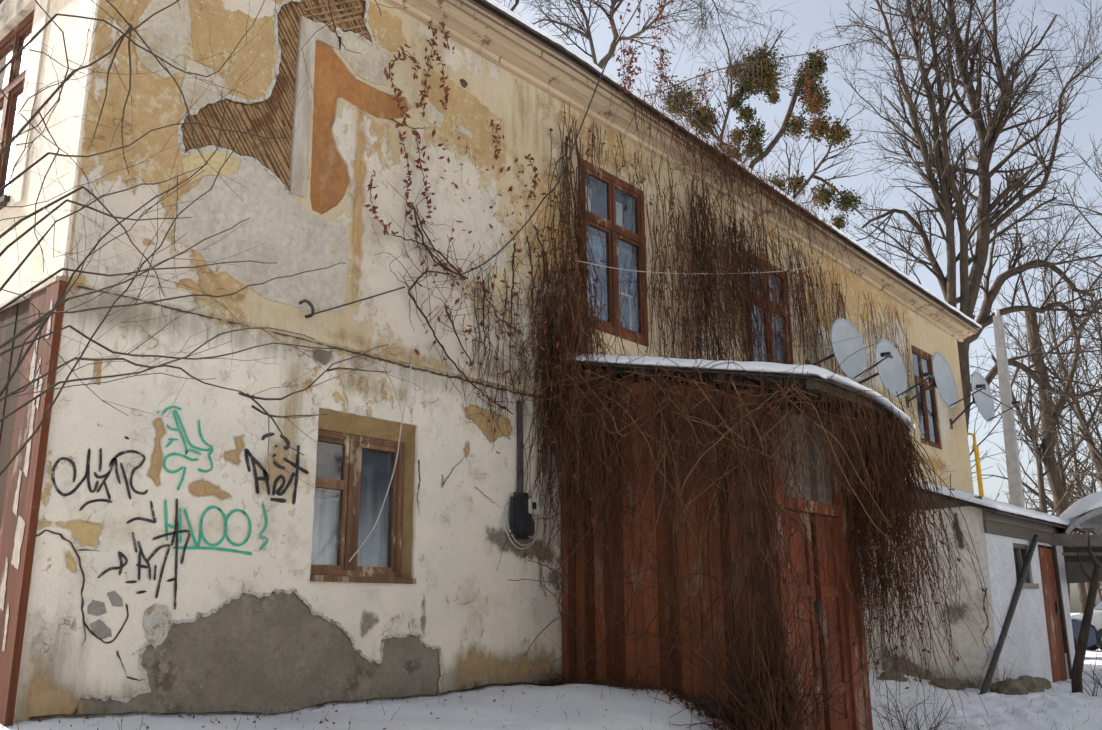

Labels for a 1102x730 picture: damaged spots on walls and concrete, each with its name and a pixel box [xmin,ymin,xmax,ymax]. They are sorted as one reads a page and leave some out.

spalling [178,0,408,214]
peeling [177,279,203,294]
peeling [464,405,512,443]
peeling [224,436,244,465]
peeling [0,299,103,651]
peeling [189,480,230,500]
spalling [71,587,444,717]
leakage [457,648,557,687]